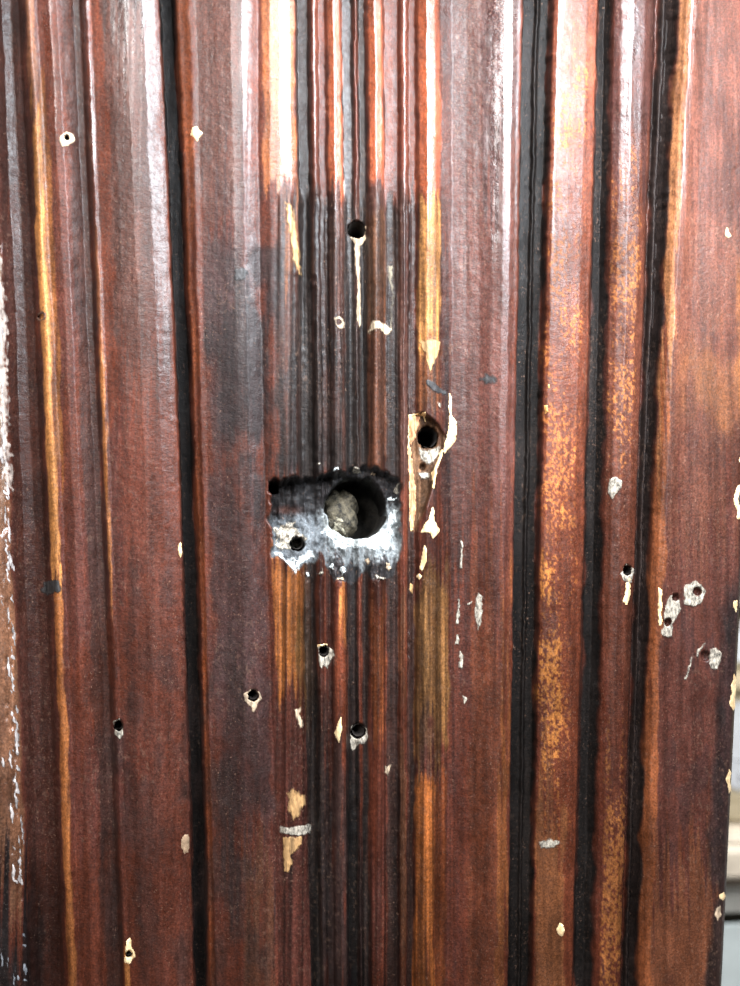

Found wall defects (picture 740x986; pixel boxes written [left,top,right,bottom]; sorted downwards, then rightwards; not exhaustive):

peeling [426,380,457,454]
spalling [658,581,706,637]
spalling [684,646,722,679]